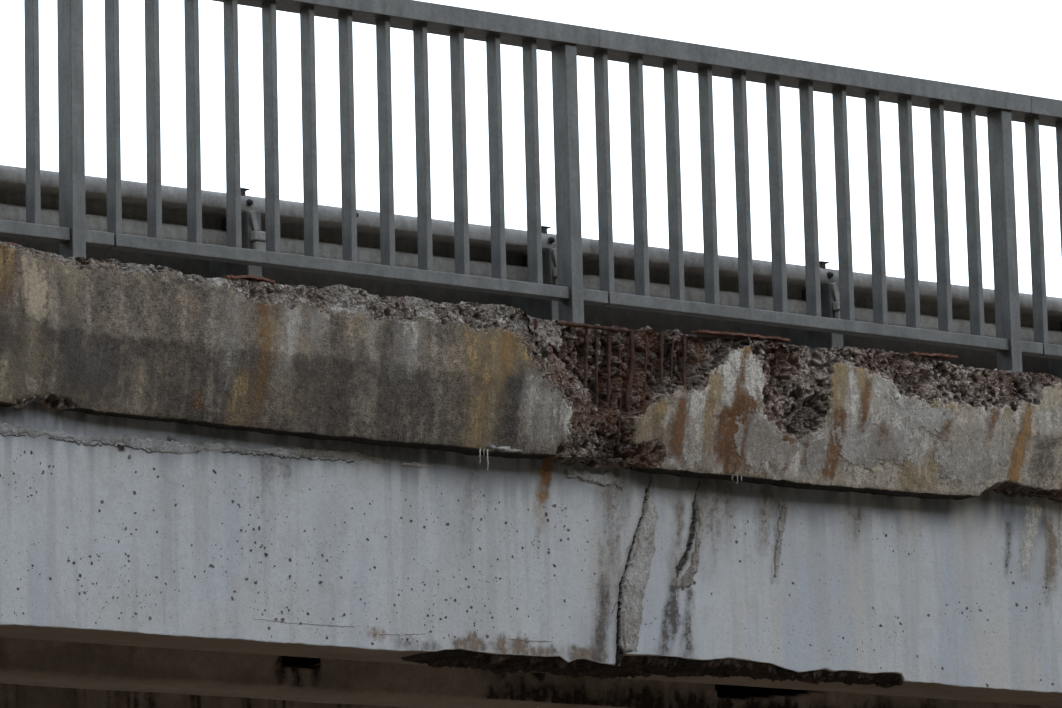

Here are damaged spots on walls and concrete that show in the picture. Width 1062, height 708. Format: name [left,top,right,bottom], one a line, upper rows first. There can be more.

leakage [21,254,53,392]
rust [638,330,790,474]
leakage [721,349,780,443]
rust [822,362,872,479]
leakage [842,365,930,466]
rust [990,404,1035,482]
spalling [67,523,183,623]
spalling [191,468,350,639]
spalling [336,487,904,699]
crack [612,474,652,660]
leakage [661,585,692,657]
crack [674,478,700,596]